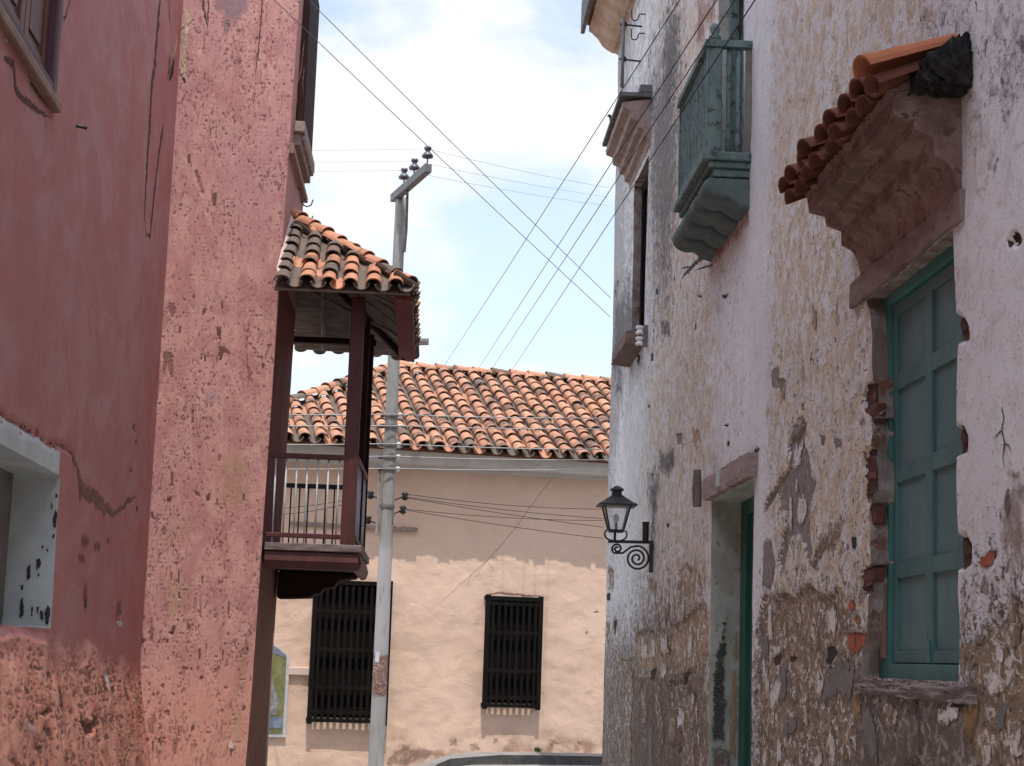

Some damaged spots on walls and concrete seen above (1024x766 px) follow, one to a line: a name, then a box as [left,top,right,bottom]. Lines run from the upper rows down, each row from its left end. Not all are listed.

crack [4,56,49,117]
crack [144,0,170,238]
crack [77,469,137,519]
flaking render [865,449,878,503]
flaking render [865,382,886,416]
crack [995,407,1011,468]
peeling [19,494,58,625]
flaking render [752,403,866,766]
flaking render [961,536,997,570]
flaking render [27,667,109,754]
flaking render [618,561,709,766]
flaking render [964,584,1024,766]